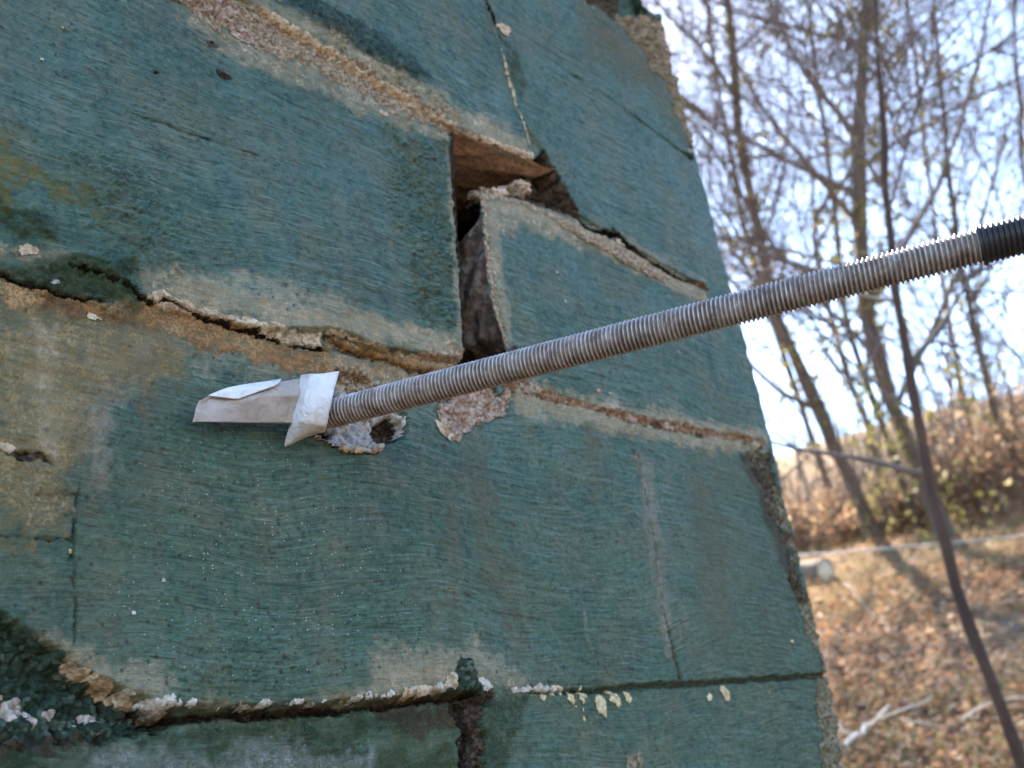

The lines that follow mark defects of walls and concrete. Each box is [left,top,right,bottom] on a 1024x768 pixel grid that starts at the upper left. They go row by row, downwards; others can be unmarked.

crack [483,0,501,41]
peeling [177,0,534,161]
crack [559,216,710,291]
crack [0,262,456,375]
spalling [333,366,382,398]
spalling [314,412,406,454]
spalling [436,380,844,768]
crack [542,634,822,695]
crack [117,690,477,730]